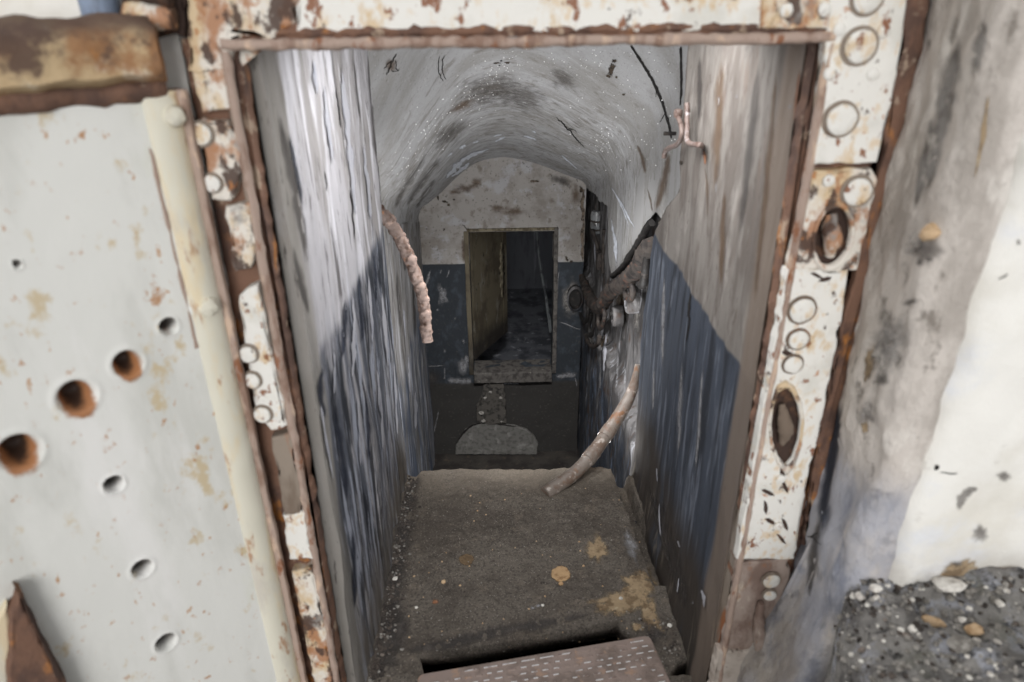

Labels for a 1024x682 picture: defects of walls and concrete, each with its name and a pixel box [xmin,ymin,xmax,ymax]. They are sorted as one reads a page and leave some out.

crack [556,117,583,146]
damp [587,536,607,560]
damp [551,566,570,586]
damp [593,569,664,637]